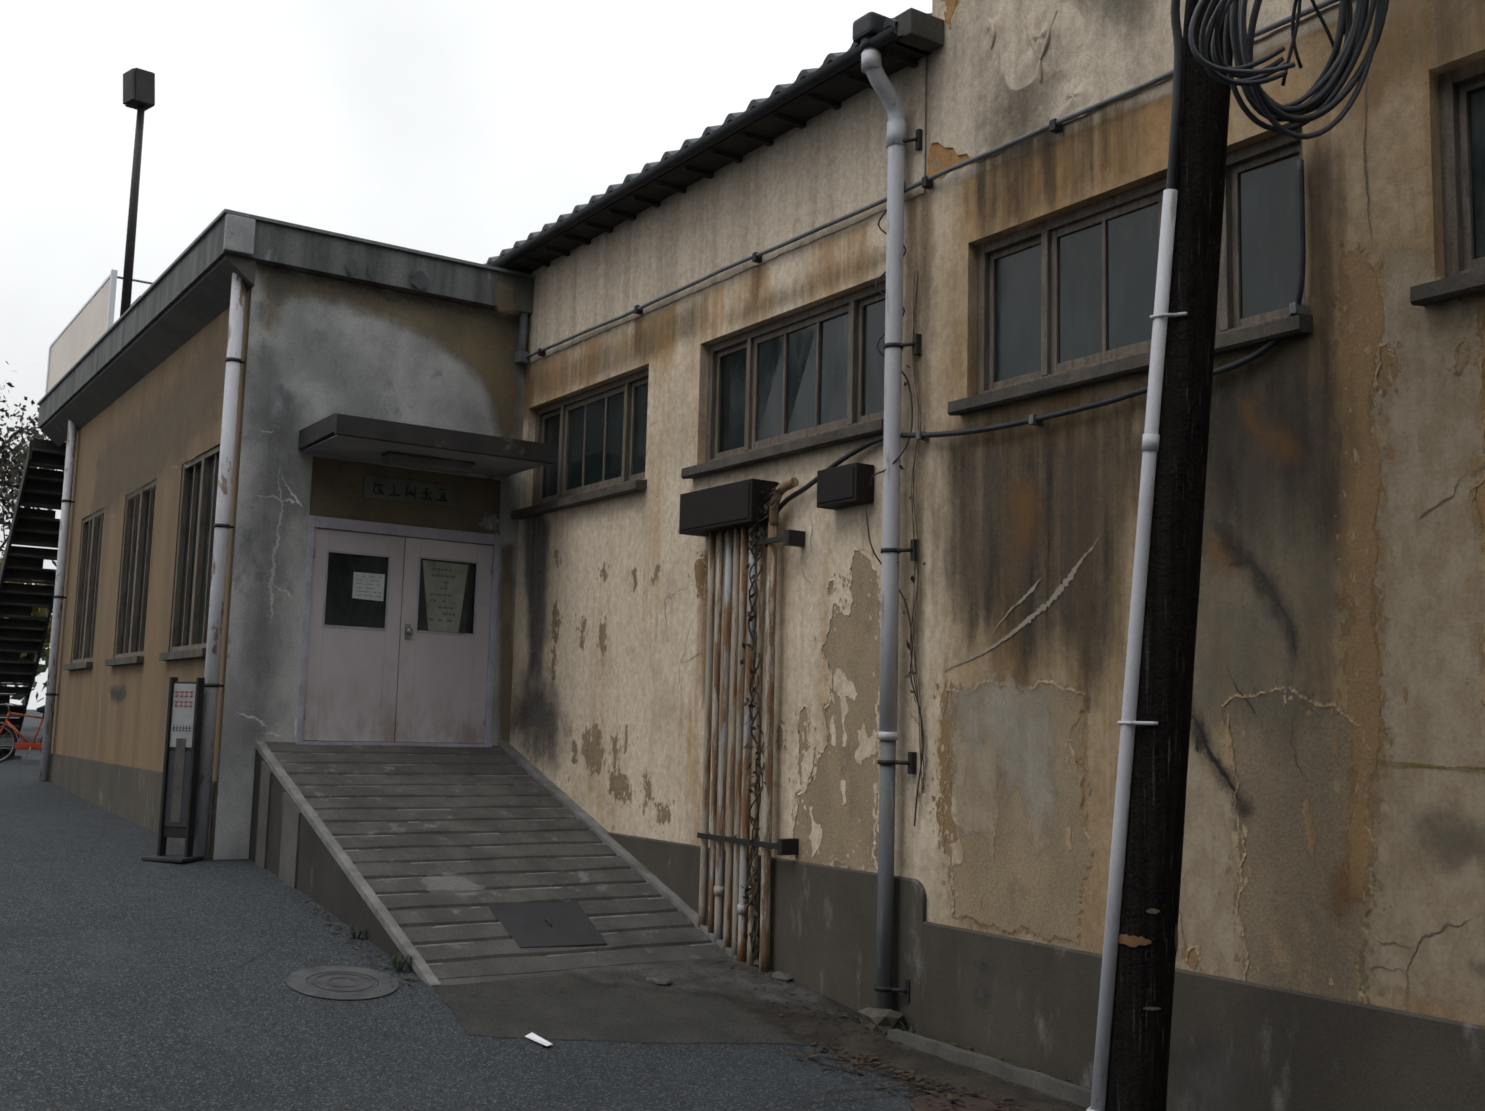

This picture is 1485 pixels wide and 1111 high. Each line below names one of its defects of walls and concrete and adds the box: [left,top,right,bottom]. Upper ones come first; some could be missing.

spalling [941,0,960,31]
spalling [927,143,974,178]
peeling [1440,311,1485,448]
crack [257,470,303,623]
damp [500,514,558,758]
peeling [547,599,607,680]
peeling [628,561,663,593]
damp [1192,342,1337,733]
peeling [568,717,674,834]
peeling [776,546,881,873]